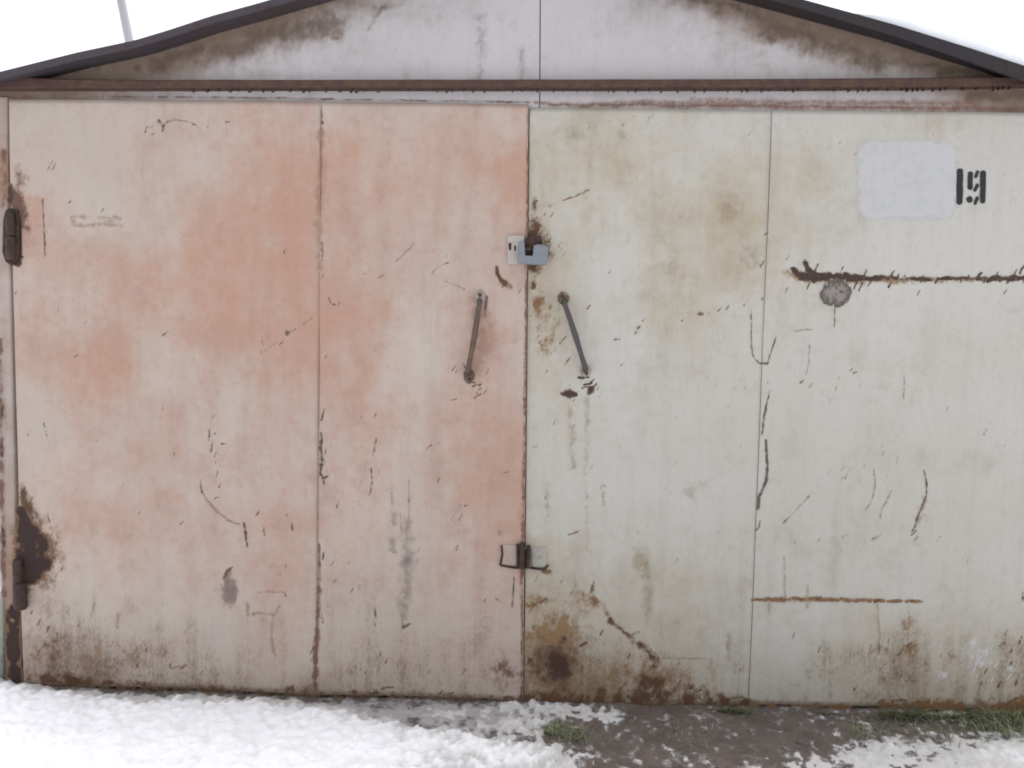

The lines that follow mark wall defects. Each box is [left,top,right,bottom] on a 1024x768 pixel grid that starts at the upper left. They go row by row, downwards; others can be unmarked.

water stain [134,12,344,73]
water stain [690,0,991,76]
rust [526,149,559,256]
rust [786,259,1024,295]
rust [495,264,567,500]
peeling [12,498,63,587]
rust [256,543,335,697]
rust [352,570,776,708]
rust [870,638,916,657]
rust [792,702,851,710]
rust [878,694,1024,713]